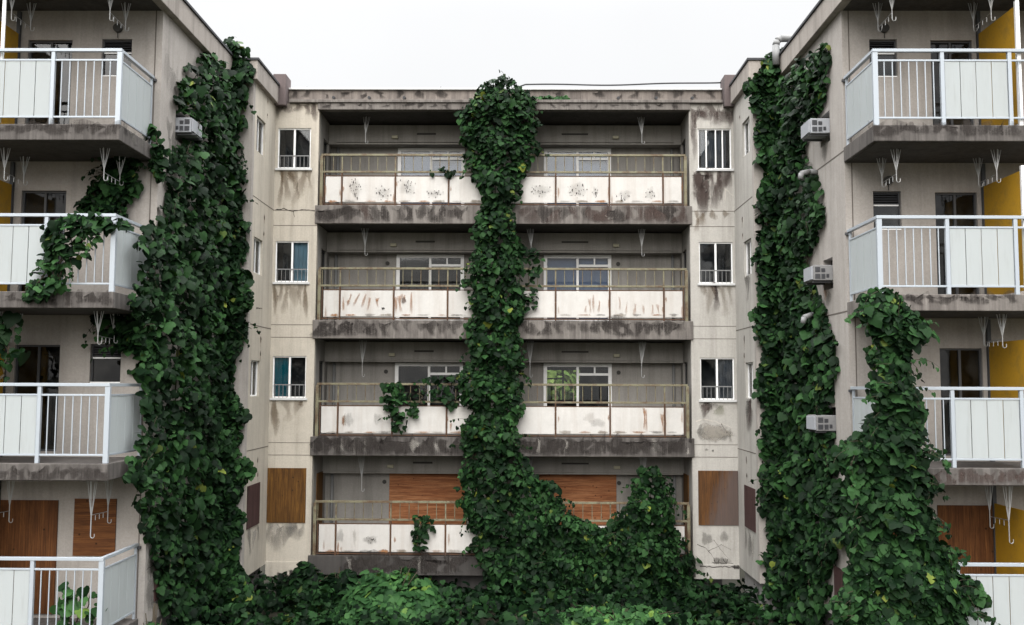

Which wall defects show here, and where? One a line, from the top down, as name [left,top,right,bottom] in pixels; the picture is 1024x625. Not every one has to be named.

water stain [277,90,389,114]
water stain [398,90,448,107]
water stain [310,434,461,453]
water stain [520,433,685,453]
crack [697,542,739,569]